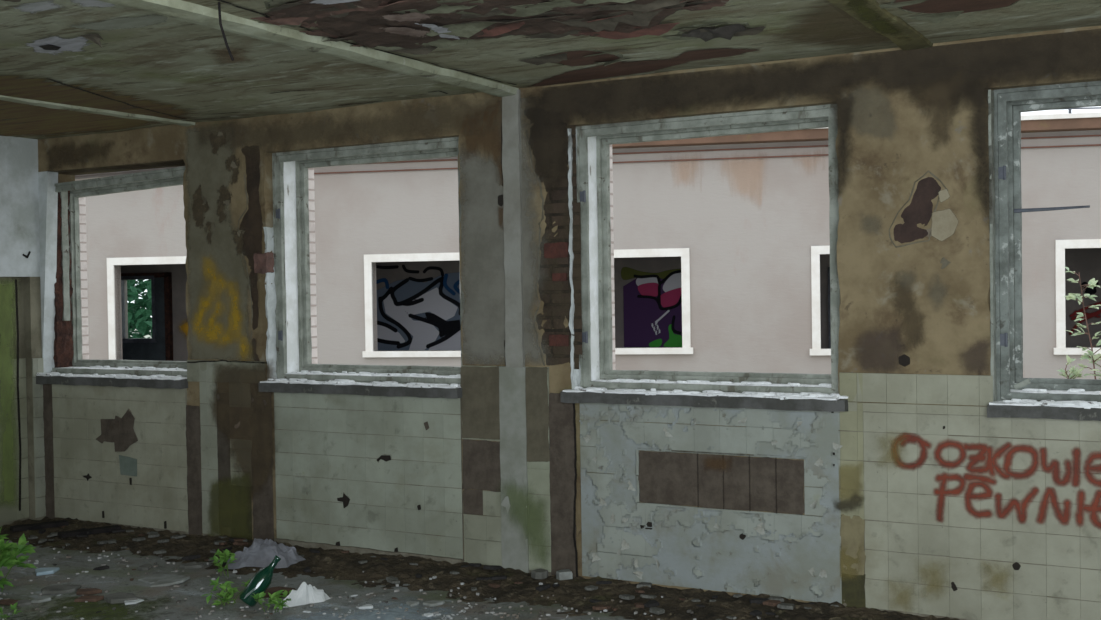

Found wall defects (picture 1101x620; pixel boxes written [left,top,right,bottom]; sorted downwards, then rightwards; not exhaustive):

peeling [27,34,103,55]
peeling [251,0,758,87]
peeling [879,0,1020,23]
spalling [192,131,274,361]
spalling [889,170,958,248]
peeling [524,110,866,615]
damp [860,283,922,370]
damp [964,343,989,371]
peeling [96,405,202,554]